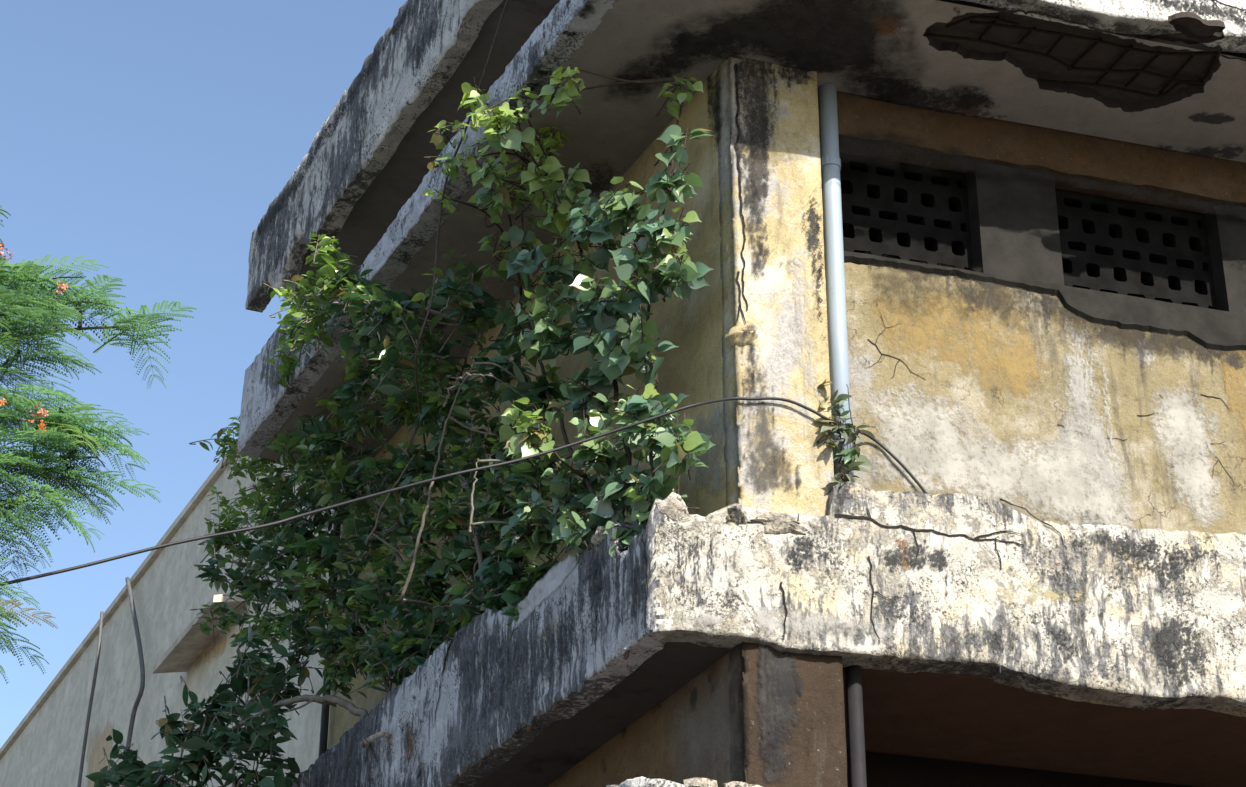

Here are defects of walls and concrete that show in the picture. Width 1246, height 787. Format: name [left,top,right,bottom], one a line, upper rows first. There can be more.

spalling [922,7,1226,112]
leakage [612,0,992,277]
peeling [1156,145,1246,159]
peeling [1189,113,1235,124]
crack [734,63,748,324]
crack [868,303,926,380]
crack [868,556,893,644]
leakage [873,539,955,595]
crack [835,498,1068,570]
leakage [1072,505,1219,595]
leakage [1144,615,1211,694]
flaking render [683,777,762,787]